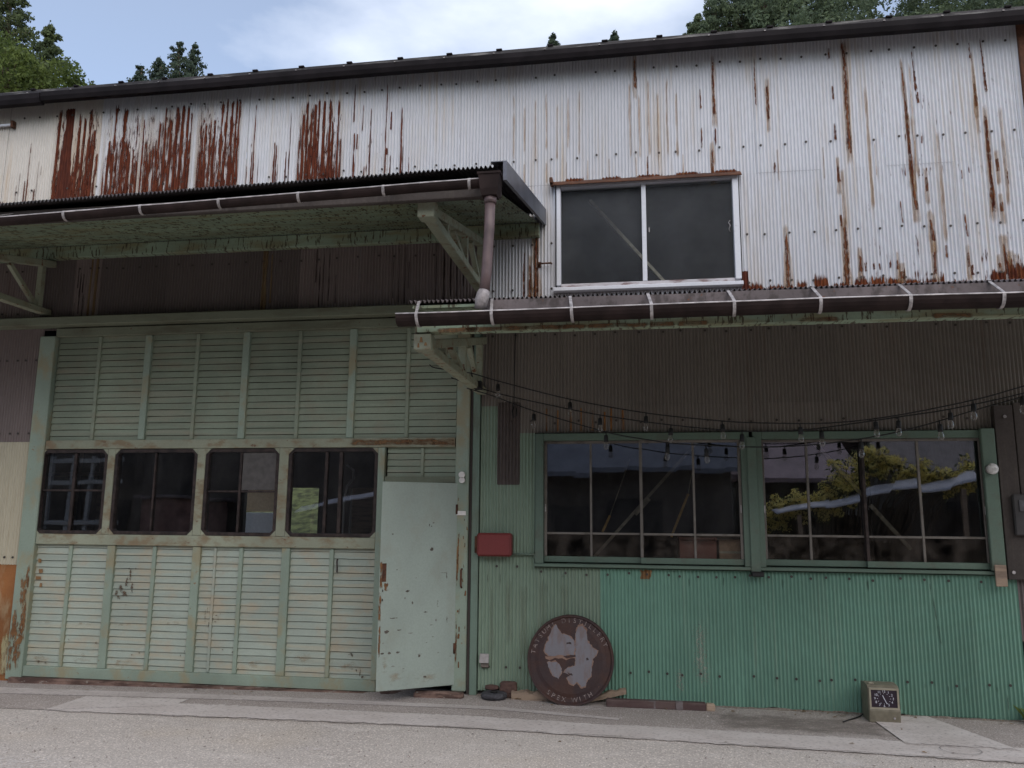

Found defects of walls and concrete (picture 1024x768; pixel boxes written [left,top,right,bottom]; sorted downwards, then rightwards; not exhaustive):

rust [15,99,258,202]
rust [272,84,409,182]
rust [828,43,852,153]
rust [901,51,943,210]
rust [968,43,1009,212]
rust [523,238,539,298]
rust [742,215,1024,290]